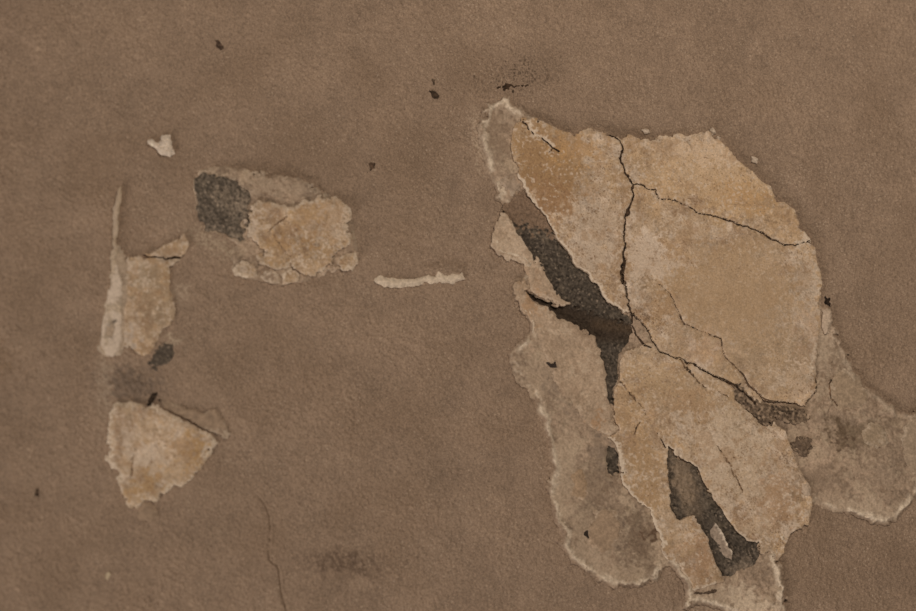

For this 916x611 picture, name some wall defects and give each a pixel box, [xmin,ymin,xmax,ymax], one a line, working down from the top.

crack [522,119,560,152]
flaking render [97,187,189,371]
flaking render [193,166,359,286]
crack [609,135,838,406]
flaking render [105,392,230,522]
crack [619,381,666,448]
flaking render [477,95,916,611]
crack [717,446,743,493]